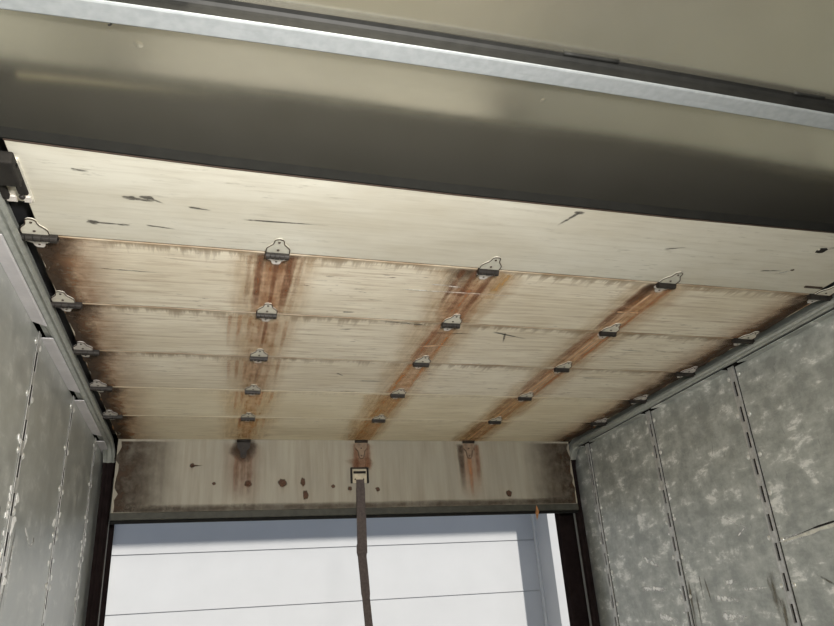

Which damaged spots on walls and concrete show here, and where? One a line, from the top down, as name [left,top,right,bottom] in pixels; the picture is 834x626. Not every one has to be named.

rust [254,256,294,303]
rust [410,270,510,366]
rust [604,285,670,328]